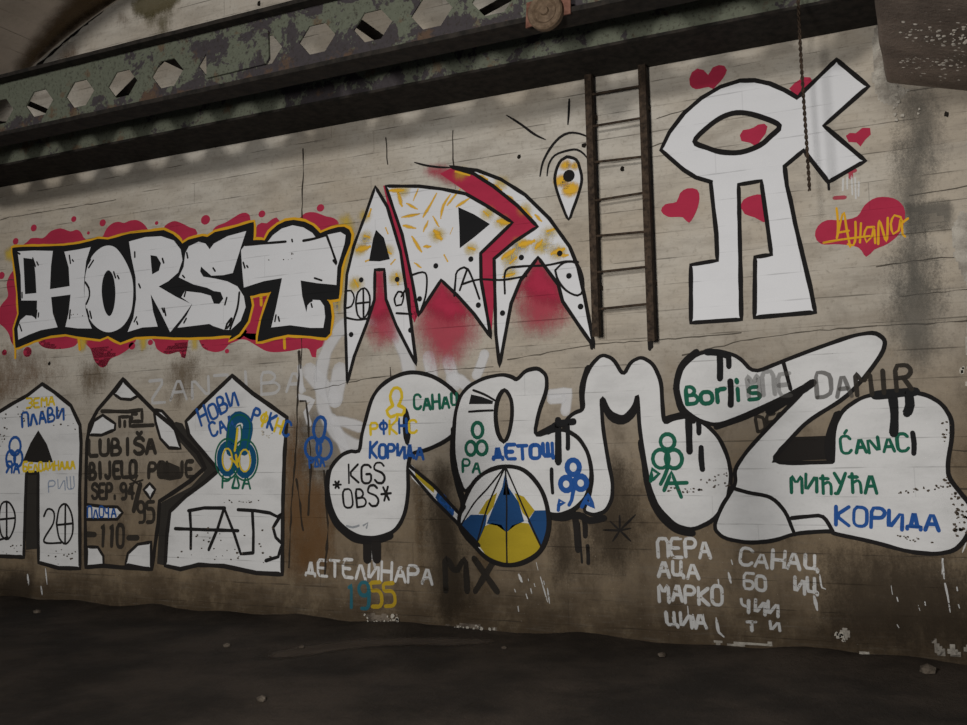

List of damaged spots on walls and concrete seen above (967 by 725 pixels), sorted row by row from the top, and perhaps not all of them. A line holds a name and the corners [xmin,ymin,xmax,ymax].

damp [132,0,177,33]
spalling [871,21,967,121]